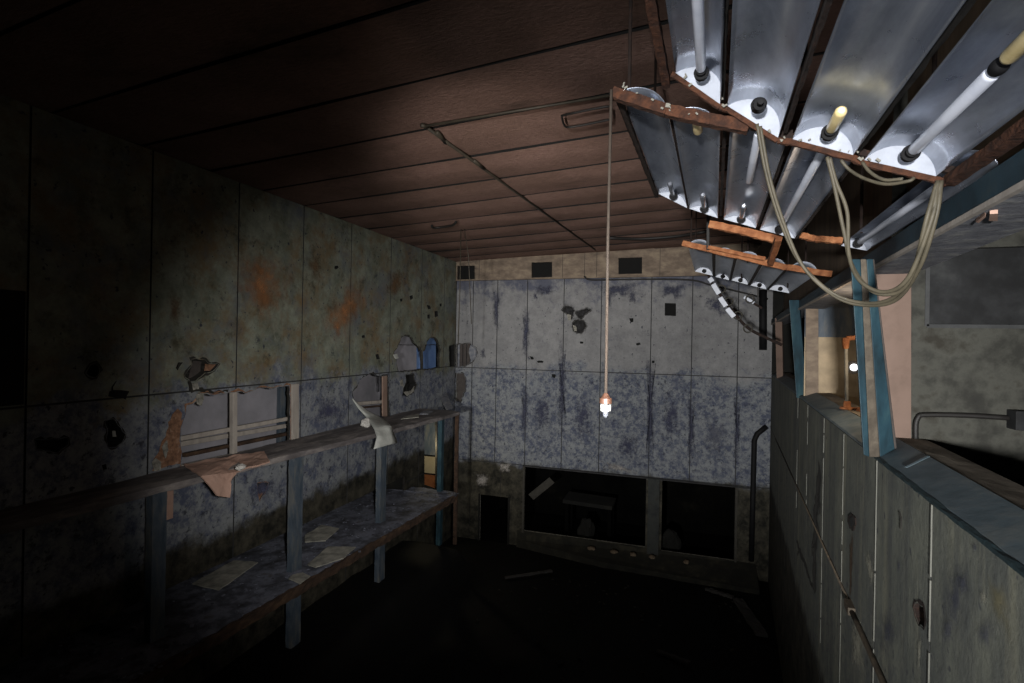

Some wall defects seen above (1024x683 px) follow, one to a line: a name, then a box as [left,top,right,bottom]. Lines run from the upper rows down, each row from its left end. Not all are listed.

spalling [561,306,591,344]
spalling [103,417,126,450]
peeling [152,356,291,471]
spalling [352,335,478,417]
leakage [522,354,590,433]
leakage [609,376,694,470]
leakage [710,406,740,453]
spalling [913,600,927,630]